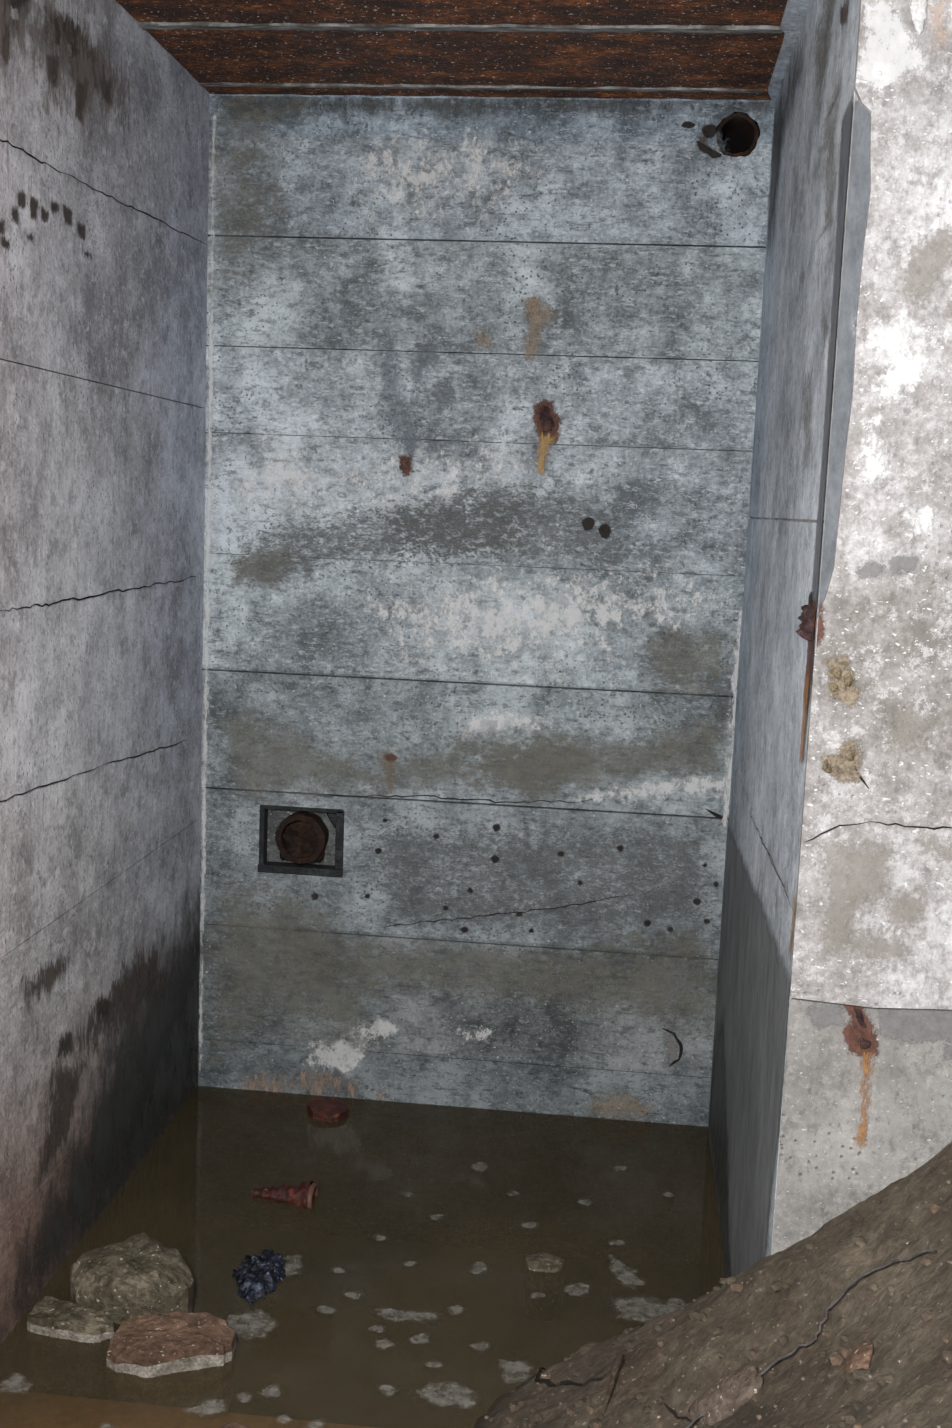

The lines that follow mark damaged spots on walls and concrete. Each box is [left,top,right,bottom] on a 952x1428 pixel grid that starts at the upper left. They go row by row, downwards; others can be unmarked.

damp [0,0,135,137]
damp [365,137,529,216]
spalling [681,122,721,158]
rust [399,454,413,477]
rust [532,398,561,475]
damp [229,435,727,692]
rust [796,592,824,762]
crack [806,821,952,842]
damp [13,822,790,1309]
rust [842,1004,879,1146]